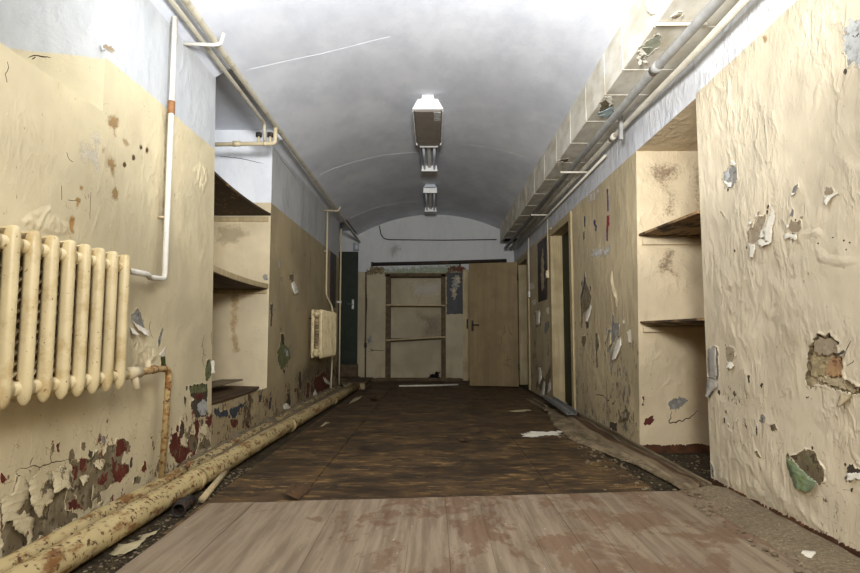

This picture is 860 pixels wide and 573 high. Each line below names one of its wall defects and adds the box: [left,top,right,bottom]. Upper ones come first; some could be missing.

peeling [635,33,663,67]
peeling [841,18,860,74]
peeling [598,96,615,118]
peeling [721,160,739,192]
peeling [733,204,775,258]
peeling [130,307,173,375]
peeling [580,270,632,369]
peeling [705,344,737,400]
spalling [803,330,860,407]
peeling [168,358,246,465]
peeling [0,434,147,559]
peeling [786,446,826,492]